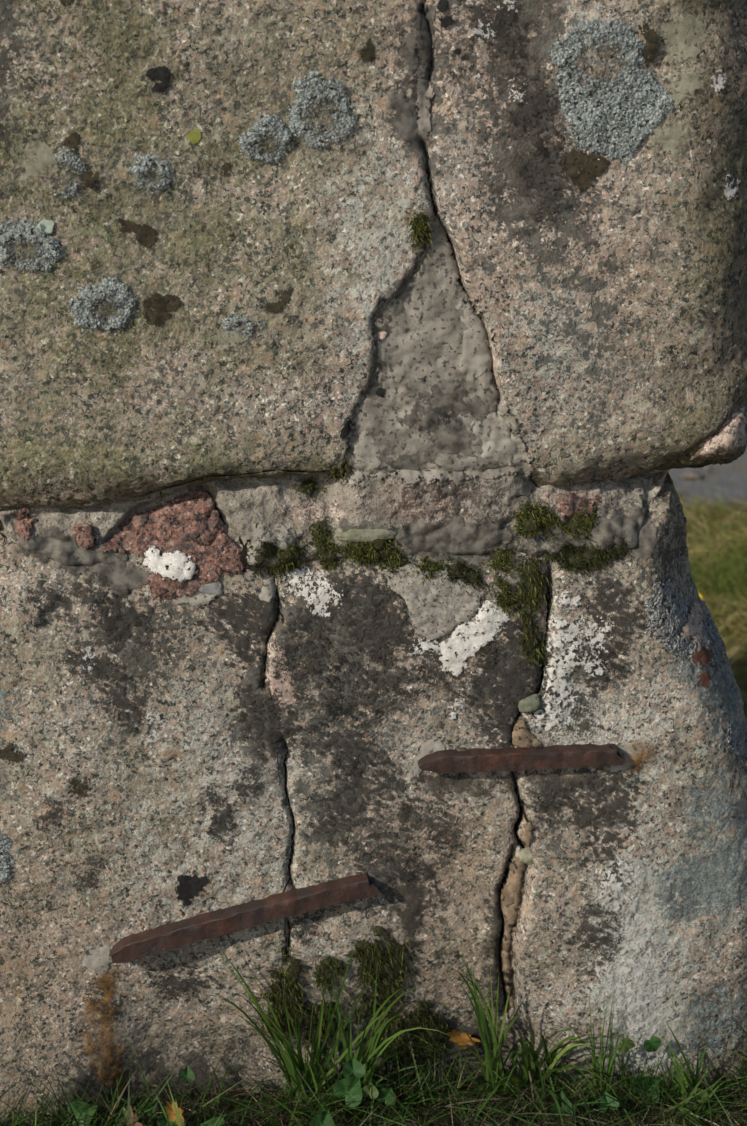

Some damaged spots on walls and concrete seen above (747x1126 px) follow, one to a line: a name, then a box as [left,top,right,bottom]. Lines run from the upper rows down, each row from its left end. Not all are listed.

water stain [376,0,453,195]
crack [399,0,432,82]
water stain [467,0,610,227]
crack [425,150,464,291]
water stain [0,742,24,765]
water stain [29,773,96,834]
water stain [71,857,104,895]
crack [269,741,295,892]
water stain [197,558,651,976]
crack [498,566,550,1022]
water stain [82,977,129,1018]
water stain [147,958,225,1007]